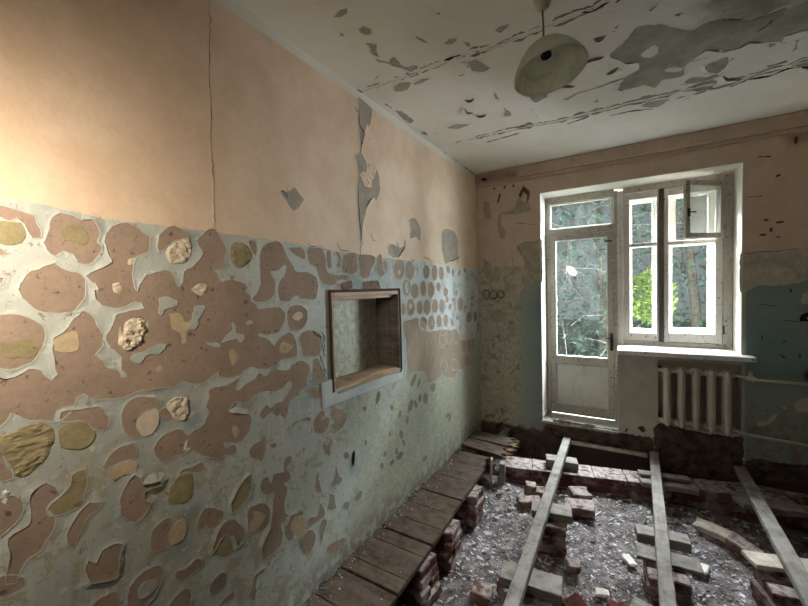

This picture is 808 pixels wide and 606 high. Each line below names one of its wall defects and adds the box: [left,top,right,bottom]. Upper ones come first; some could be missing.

peeling [527,0,808,116]
crack [206,0,218,233]
peeling [0,24,508,606]
peeling [514,238,543,283]
peeling [739,218,808,294]
spalling [488,419,808,486]